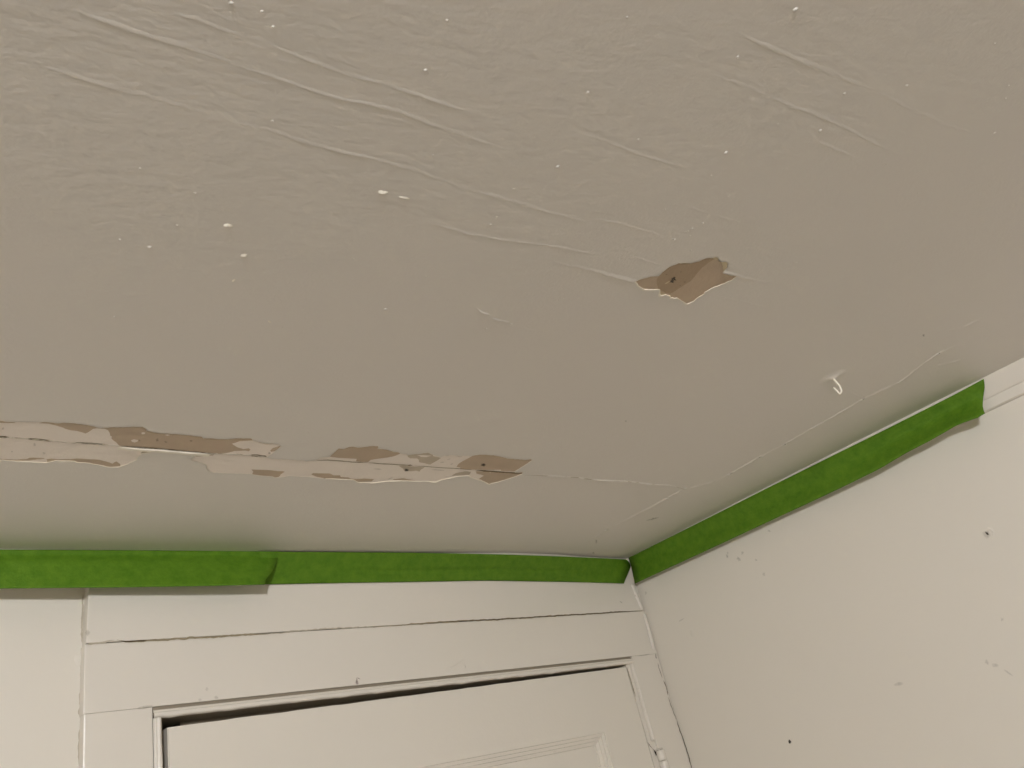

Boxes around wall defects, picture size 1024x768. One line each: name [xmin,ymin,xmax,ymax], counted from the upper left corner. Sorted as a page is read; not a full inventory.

peeling [635,257,737,305]
peeling [0,421,532,485]